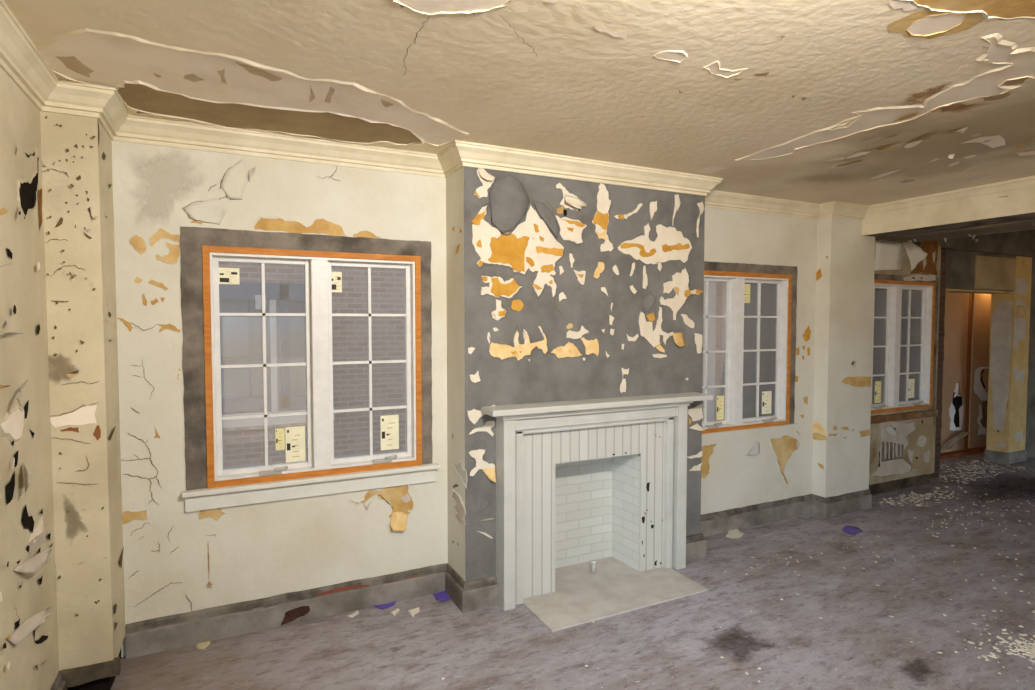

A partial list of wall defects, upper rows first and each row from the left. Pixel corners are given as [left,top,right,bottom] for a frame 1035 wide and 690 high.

spalling [0,122,107,239]
peeling [652,50,769,80]
peeling [695,33,1035,181]
spalling [888,0,1035,56]
peeling [452,168,704,362]
peeling [0,380,61,588]
crack [50,381,98,485]
peeling [50,405,116,441]
crack [121,359,178,554]
flaking render [109,216,433,491]
spalling [348,485,416,533]
spalling [704,238,949,489]